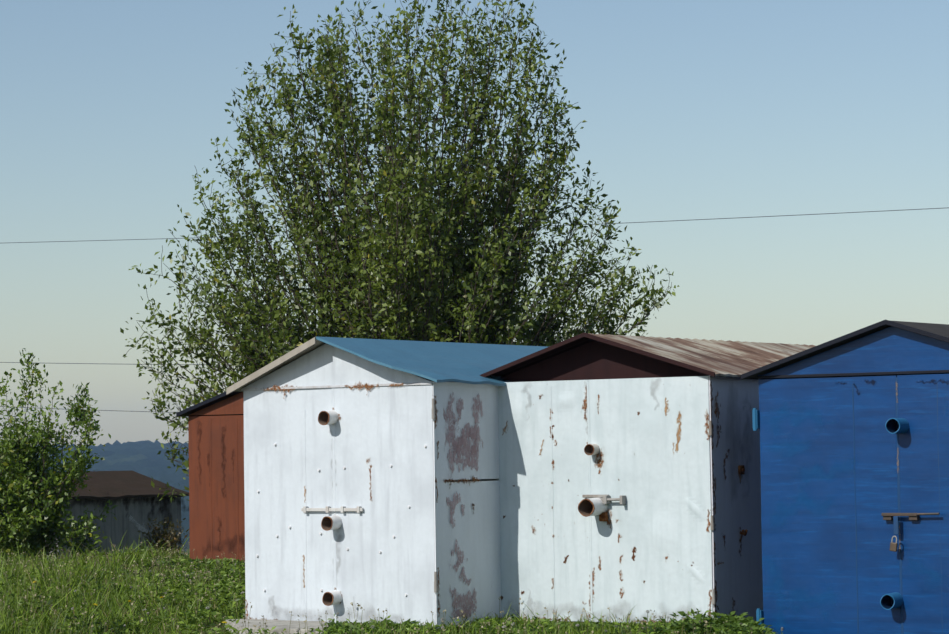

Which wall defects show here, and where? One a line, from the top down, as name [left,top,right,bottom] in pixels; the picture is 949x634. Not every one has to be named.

corrosion [345,382,403,390]
peeling [443,393,483,473]
corrosion [705,382,721,450]
corrosion [706,462,725,566]
peeling [446,492,477,619]
corrosion [708,580,745,620]